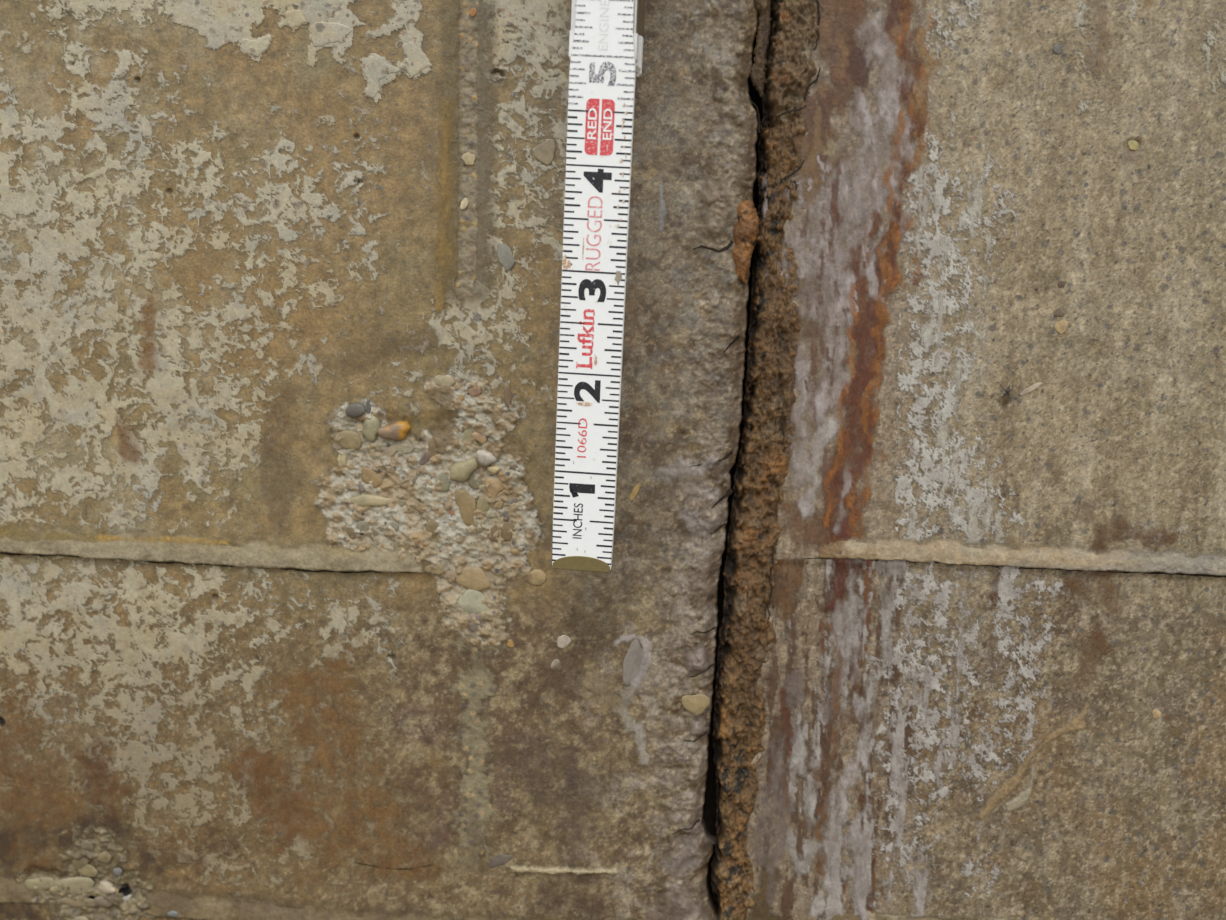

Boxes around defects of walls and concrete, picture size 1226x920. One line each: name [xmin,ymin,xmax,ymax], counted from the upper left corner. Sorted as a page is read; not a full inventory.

crack [748,0,821,218]
crack [0,551,82,559]
crack [119,559,235,567]
peeling [0,0,571,920]
crack [266,567,407,575]
crack [675,240,784,912]
corrosion [812,0,937,874]
water stain [748,0,1070,920]
crack [872,560,1226,578]